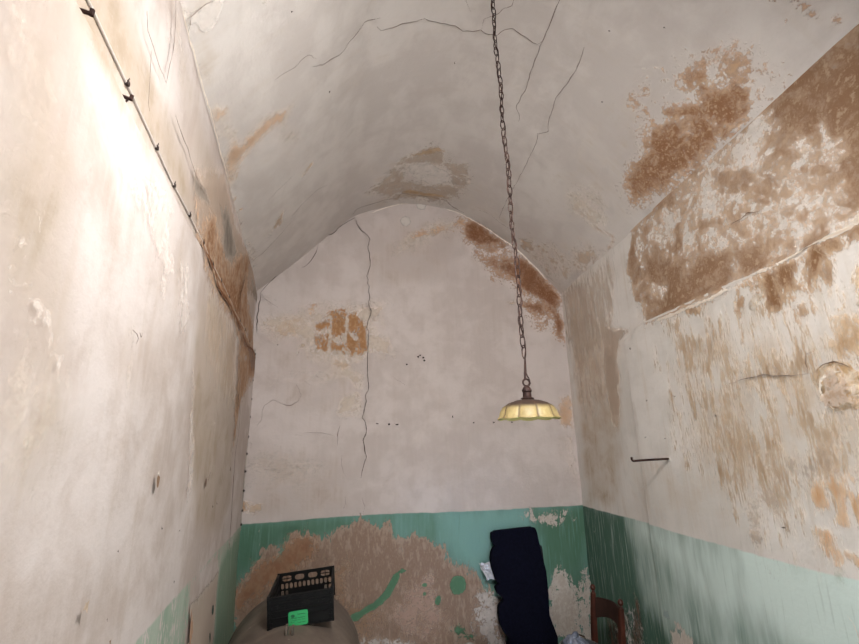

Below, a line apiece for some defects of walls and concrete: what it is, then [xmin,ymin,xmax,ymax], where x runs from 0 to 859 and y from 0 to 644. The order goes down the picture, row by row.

crack [279,0,560,119]
water stain [221,209,237,264]
crack [203,186,324,545]
crack [300,49,584,476]
water stain [564,273,622,424]
water stain [626,24,859,546]
peeling [233,513,506,644]
peeling [518,507,576,528]
peeling [548,564,591,640]
peeling [670,621,694,644]